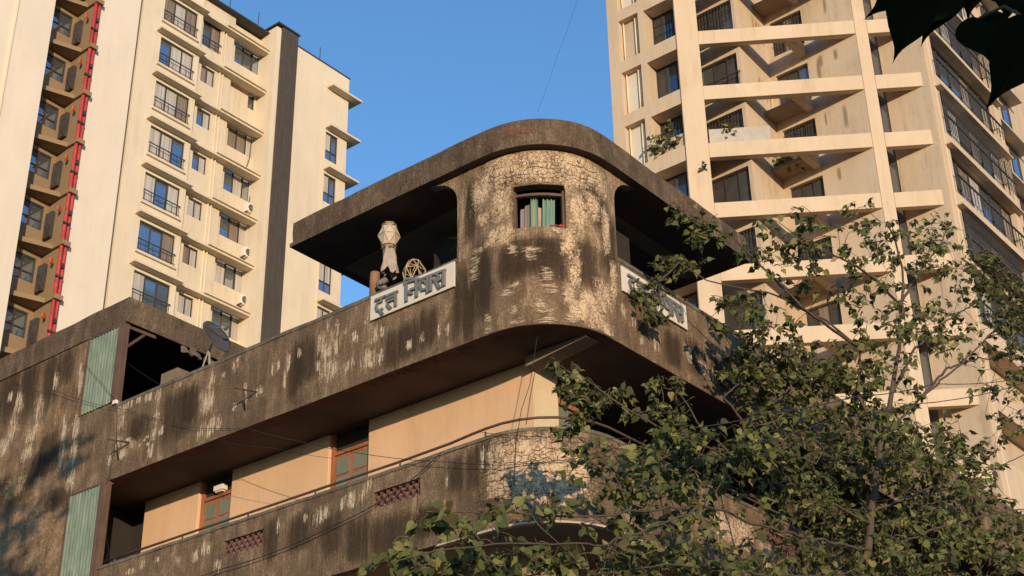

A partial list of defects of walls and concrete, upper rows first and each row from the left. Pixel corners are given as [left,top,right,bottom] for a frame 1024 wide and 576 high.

crack [453,159,600,290]
water stain [454,175,615,336]
water stain [0,350,73,420]
peeling [271,350,302,388]
peeling [316,309,439,386]
water stain [0,434,57,509]
flaking render [0,371,59,503]
peeling [57,363,84,494]
water stain [450,443,489,488]
crack [477,432,621,506]
flaking render [0,507,70,575]
water stain [323,507,439,561]